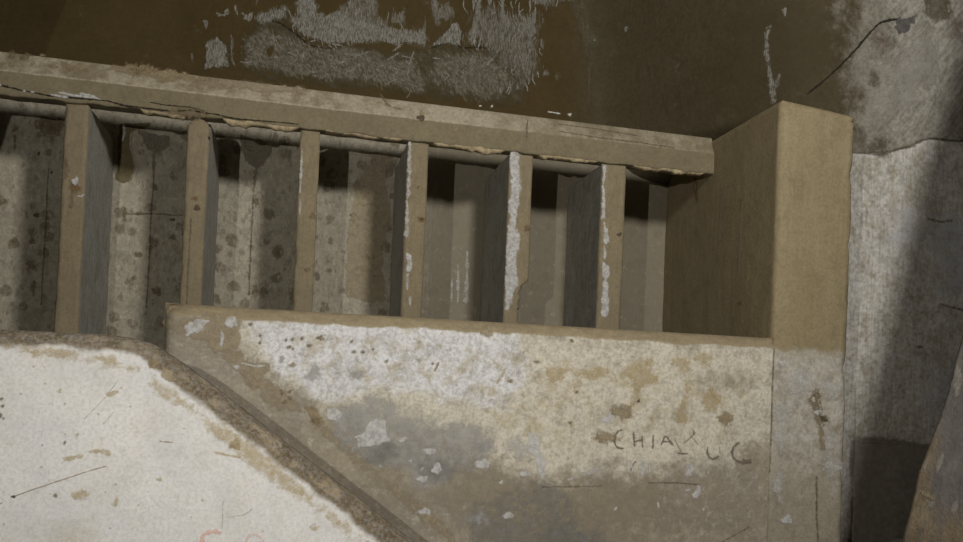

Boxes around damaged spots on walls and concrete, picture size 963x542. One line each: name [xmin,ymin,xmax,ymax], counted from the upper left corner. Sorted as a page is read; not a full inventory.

spalling [205,37,229,69]
spalling [241,15,524,107]
crack [807,14,917,94]
crack [1,85,295,124]